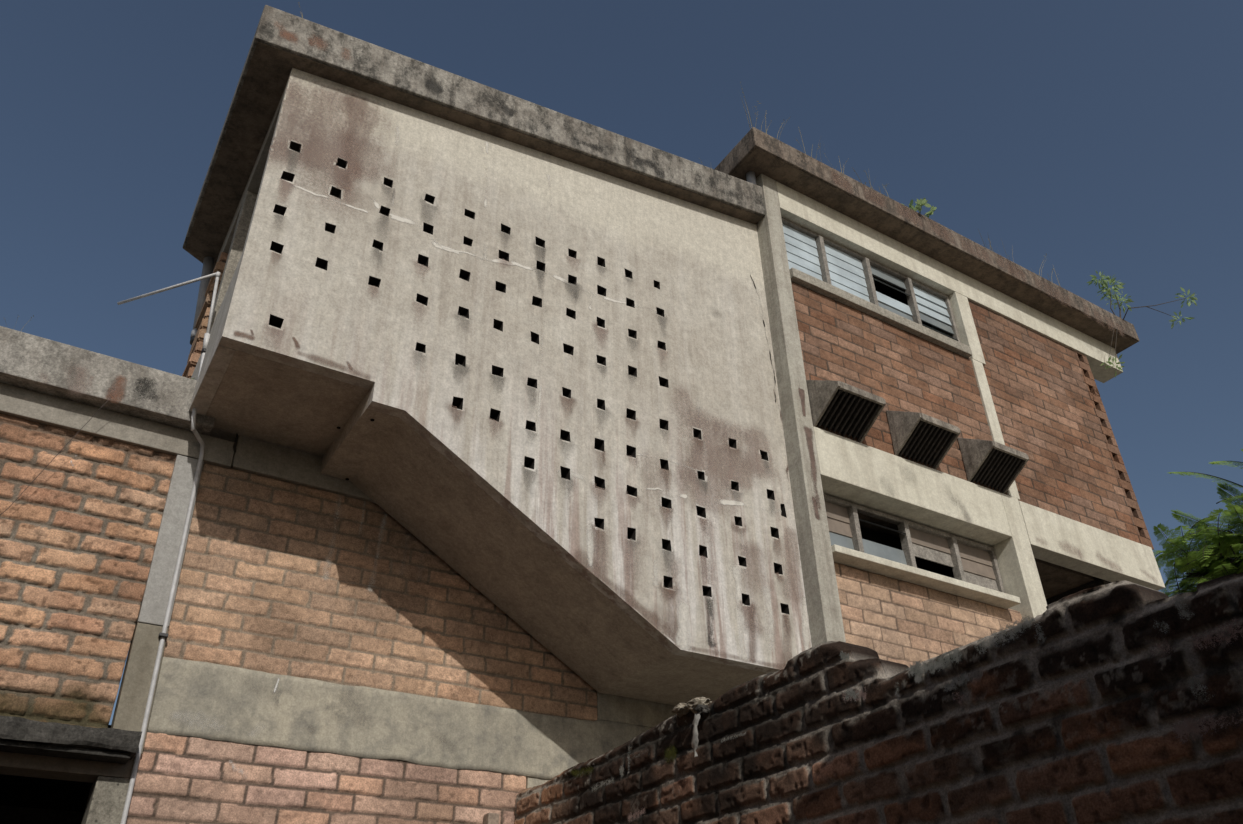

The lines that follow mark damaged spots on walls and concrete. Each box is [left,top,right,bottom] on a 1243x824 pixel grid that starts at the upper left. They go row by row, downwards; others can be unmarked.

water stain [271,127,354,189]
crack [291,184,567,283]
crack [589,296,666,316]
water stain [693,416,766,519]
water stain [576,525,602,574]
water stain [622,550,690,649]
water stain [732,548,810,660]